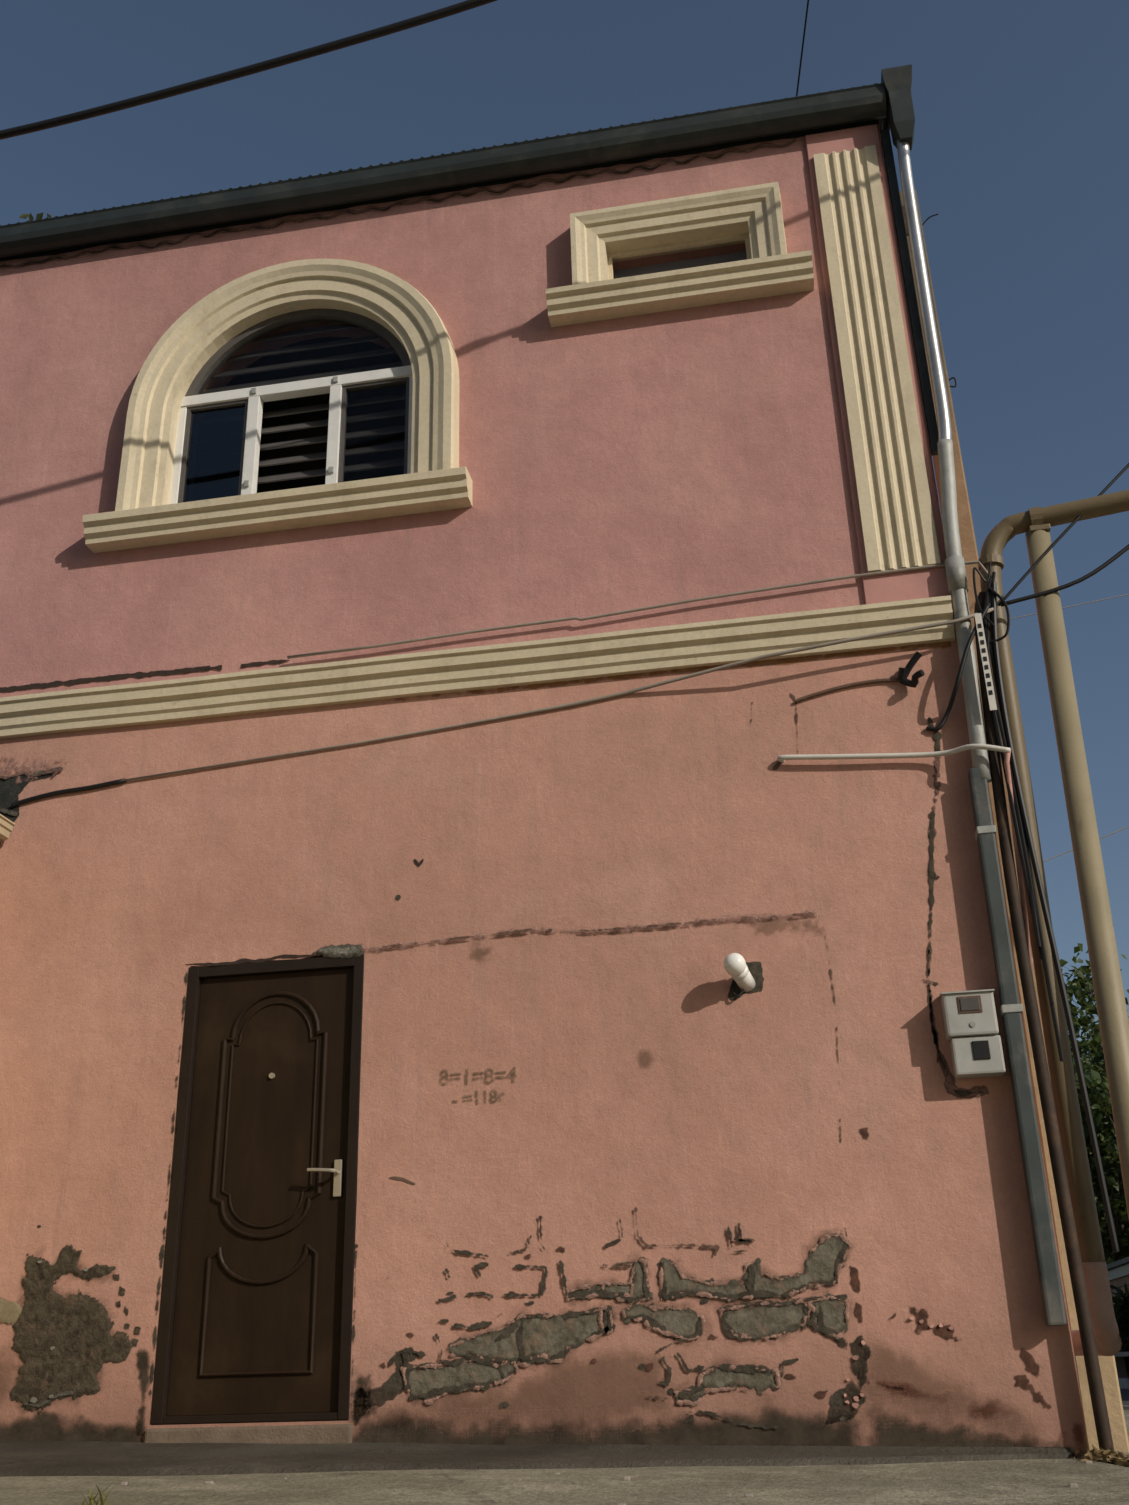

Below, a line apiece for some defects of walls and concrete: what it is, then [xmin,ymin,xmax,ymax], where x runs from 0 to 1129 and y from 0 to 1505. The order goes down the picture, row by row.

crack [0,660,289,692]
flaking render [0,758,63,821]
crack [362,912,839,1061]
crack [924,717,989,1098]
flaking render [10,1245,150,1435]
crack [149,954,313,1396]
crack [351,1216,567,1405]
flaking render [353,1233,871,1425]
crack [603,1207,754,1268]
peeling [1014,1348,1051,1409]